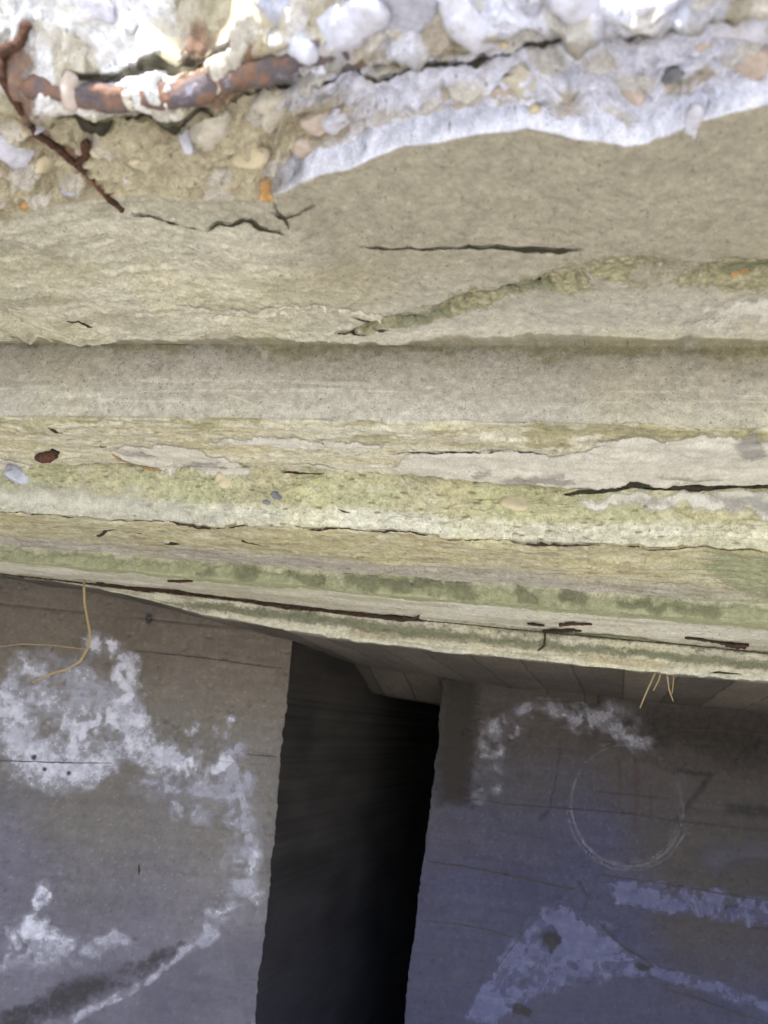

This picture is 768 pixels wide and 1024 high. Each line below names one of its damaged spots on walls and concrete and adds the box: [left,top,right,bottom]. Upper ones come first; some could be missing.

corrosion [5,47,38,143]
corrosion [176,19,238,110]
spalling [0,0,768,221]
crack [134,207,313,236]
corrosion [259,179,274,203]
crack [362,245,578,255]
peeling [595,437,664,450]
peeling [499,475,575,512]
crack [570,482,768,494]
damp [0,633,261,946]
damp [2,885,129,969]
damp [466,905,768,1024]